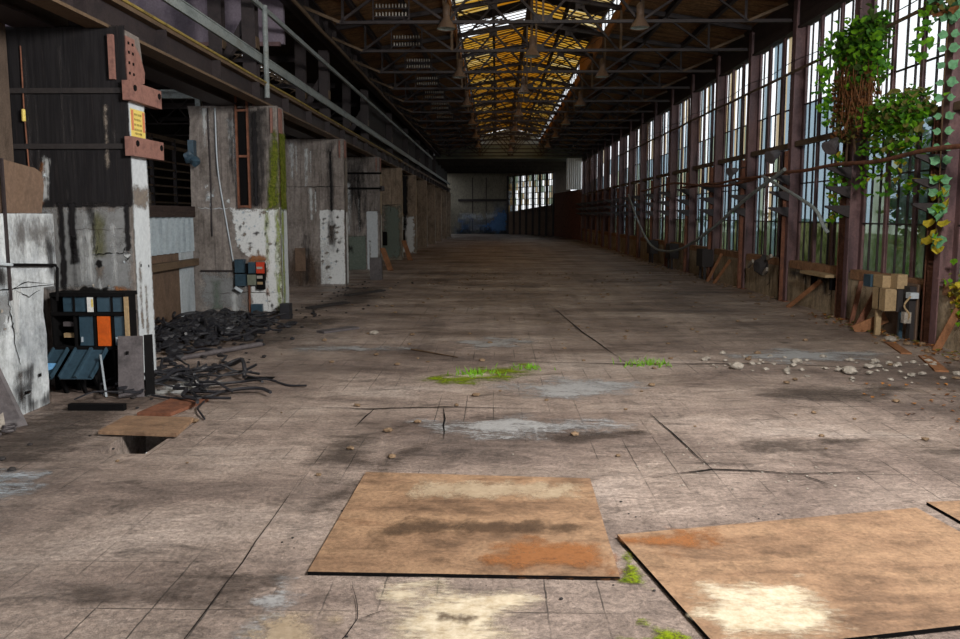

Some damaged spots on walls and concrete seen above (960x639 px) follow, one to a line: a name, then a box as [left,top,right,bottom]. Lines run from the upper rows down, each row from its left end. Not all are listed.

water stain [11,290,20,333]
water stain [47,185,149,290]
peeling [227,199,286,312]
water stain [251,111,286,311]